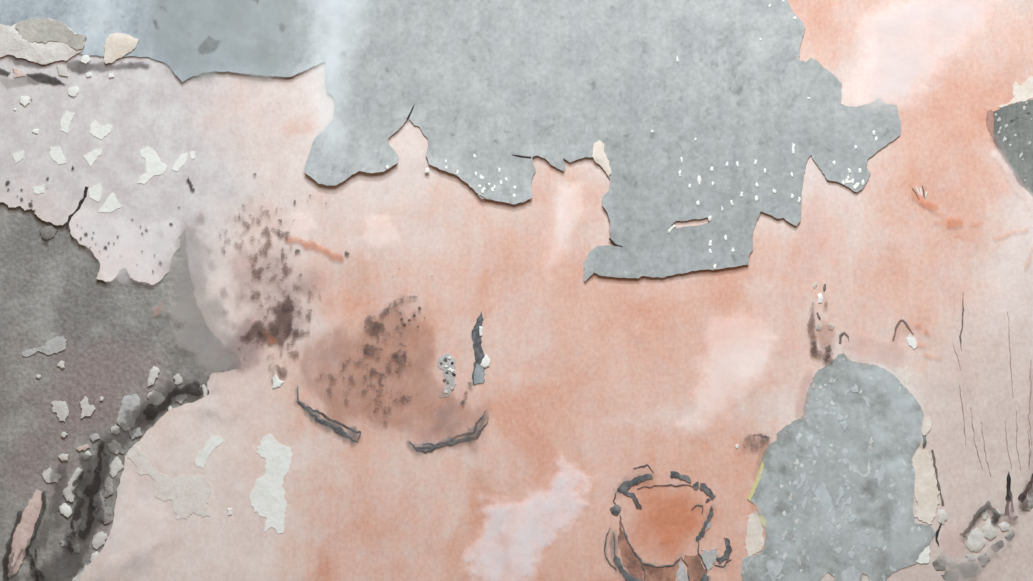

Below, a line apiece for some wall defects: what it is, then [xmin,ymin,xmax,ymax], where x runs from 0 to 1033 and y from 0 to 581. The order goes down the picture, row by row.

peeling [0,0,901,281]
flaking render [0,177,241,581]
water stain [173,205,314,389]
peeling [249,434,292,534]
water stain [297,387,361,443]
water stain [320,296,425,425]
water stain [408,414,489,453]
water stain [438,311,490,405]
rust [604,464,732,581]
peeling [807,282,849,363]
peeling [911,450,948,524]
flaking render [916,472,1018,581]